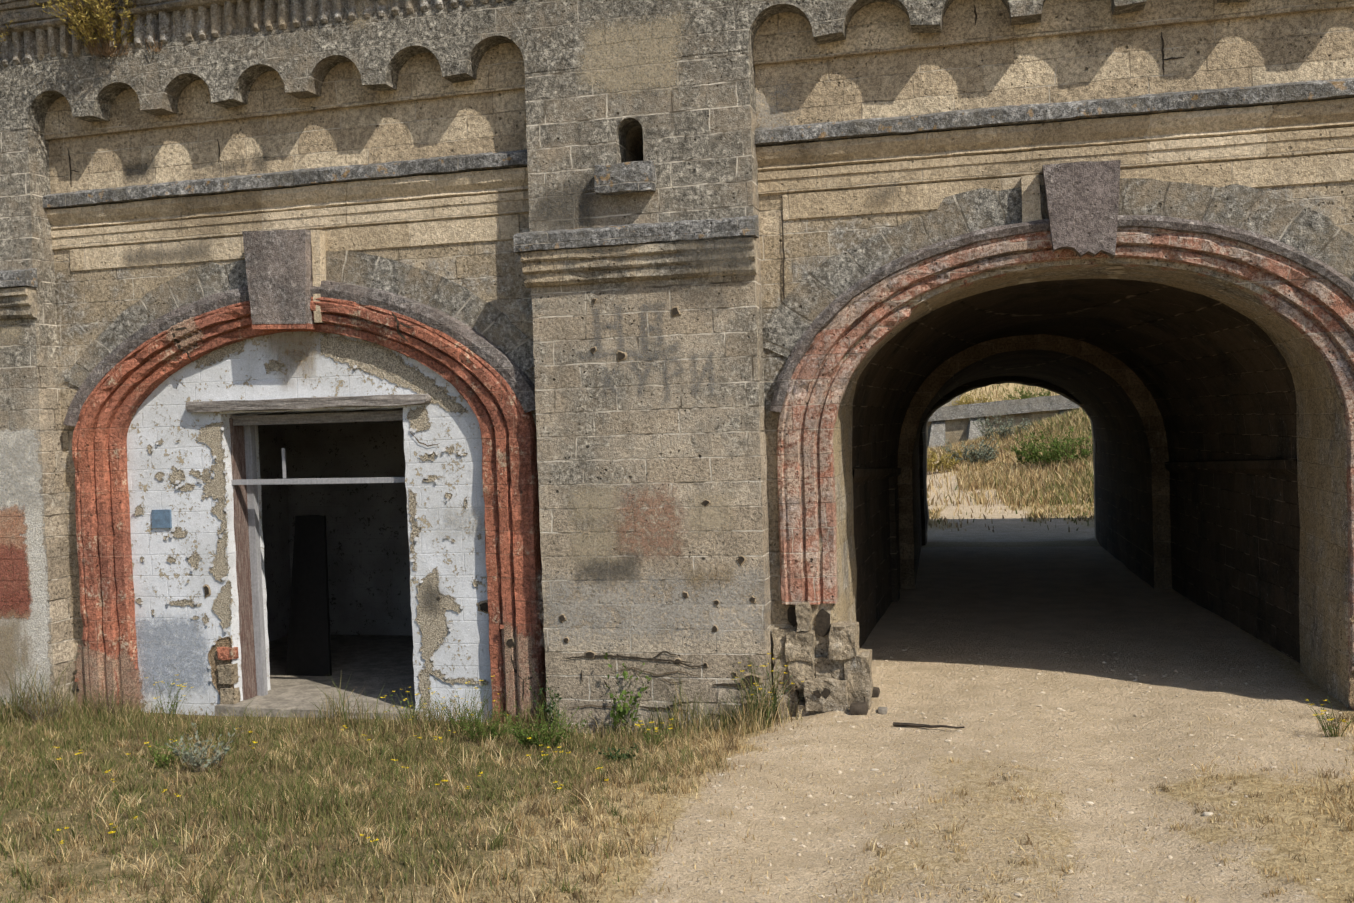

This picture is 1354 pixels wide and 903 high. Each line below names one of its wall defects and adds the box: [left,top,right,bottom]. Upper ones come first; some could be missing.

spalling [166,317,246,369]
peeling [264,359,286,375]
peeling [319,332,468,432]
peeling [135,422,239,660]
peeling [408,444,545,723]
spalling [732,602,873,718]